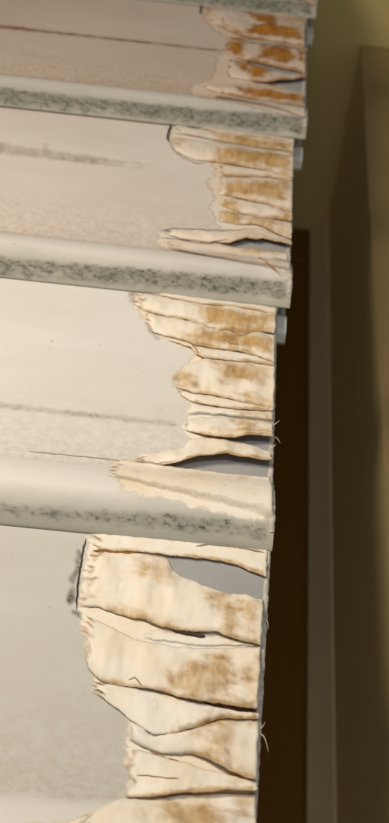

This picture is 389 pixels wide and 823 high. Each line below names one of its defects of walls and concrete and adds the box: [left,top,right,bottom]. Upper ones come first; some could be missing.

peeling [190,6,308,127]
peeling [156,126,294,293]
peeling [109,292,280,532]
peeling [52,534,271,823]
crack [139,751,179,779]